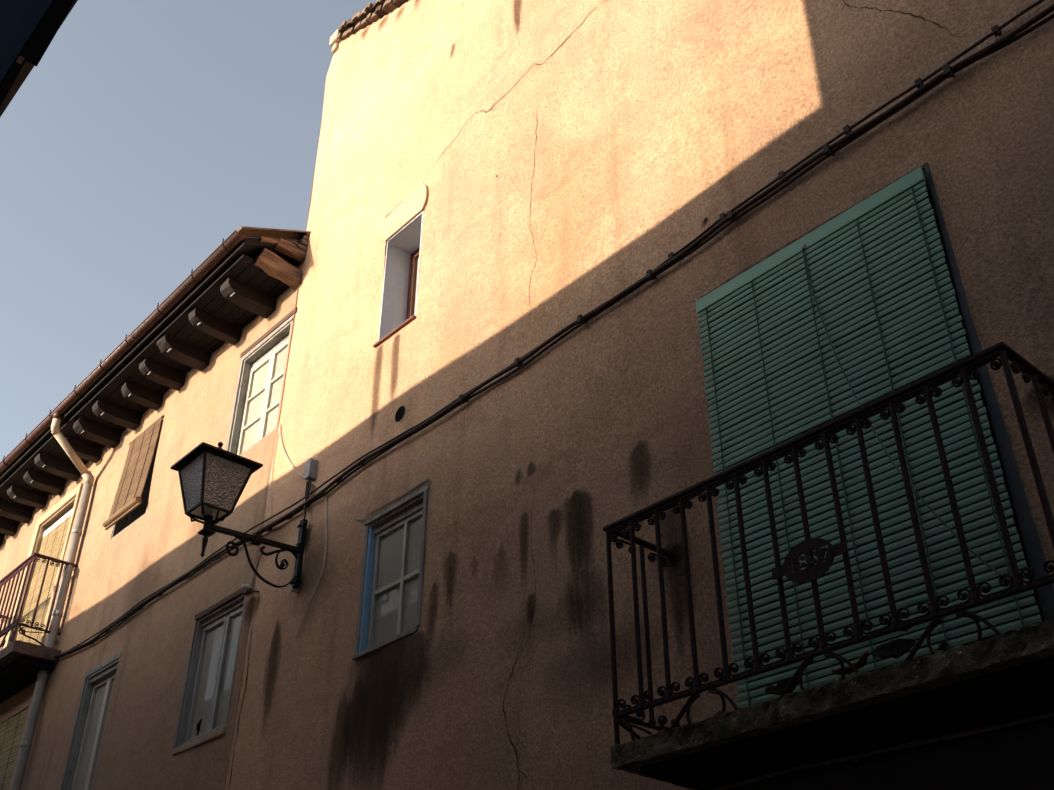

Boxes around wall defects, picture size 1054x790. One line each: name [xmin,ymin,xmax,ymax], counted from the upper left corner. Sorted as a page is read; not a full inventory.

crack [425,0,606,179]
crack [841,0,968,38]
leakage [372,335,399,422]
leakage [330,552,454,782]
crack [503,499,536,790]